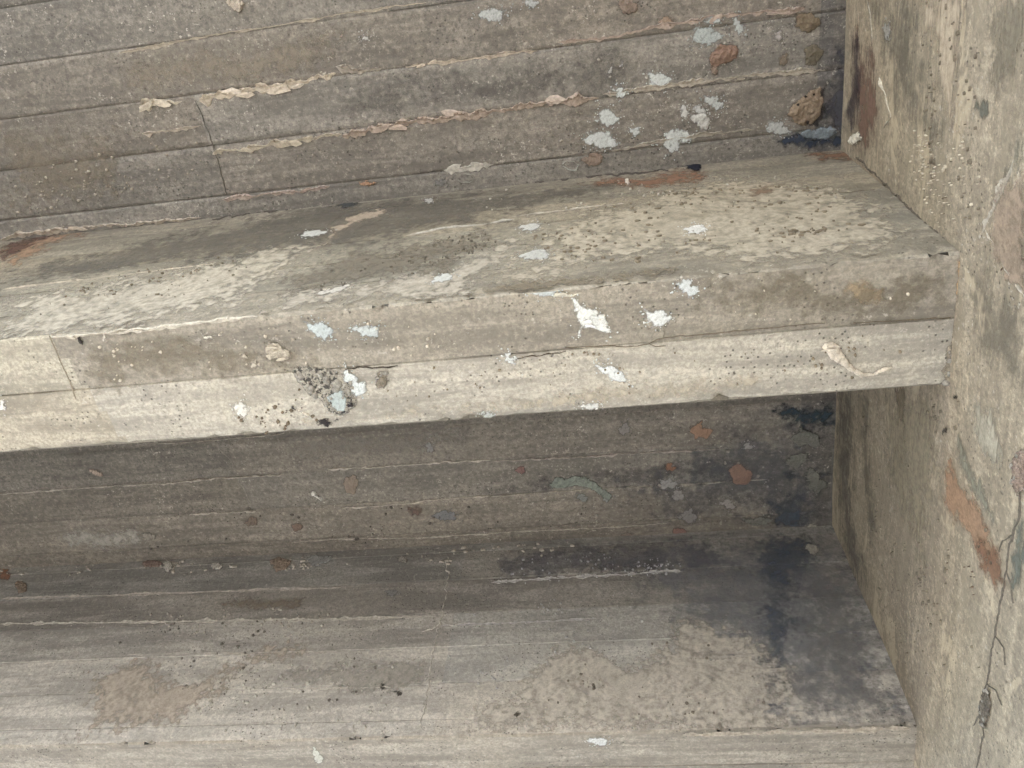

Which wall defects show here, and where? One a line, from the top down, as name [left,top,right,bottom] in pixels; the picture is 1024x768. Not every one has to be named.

peeling [220,83,304,98]
peeling [139,99,172,112]
peeling [371,124,407,133]
peeling [276,136,313,148]
corrosion [596,169,707,189]
spalling [238,342,357,435]
corrosion [944,458,1003,587]
damp [473,403,902,733]
crack [973,491,1021,768]